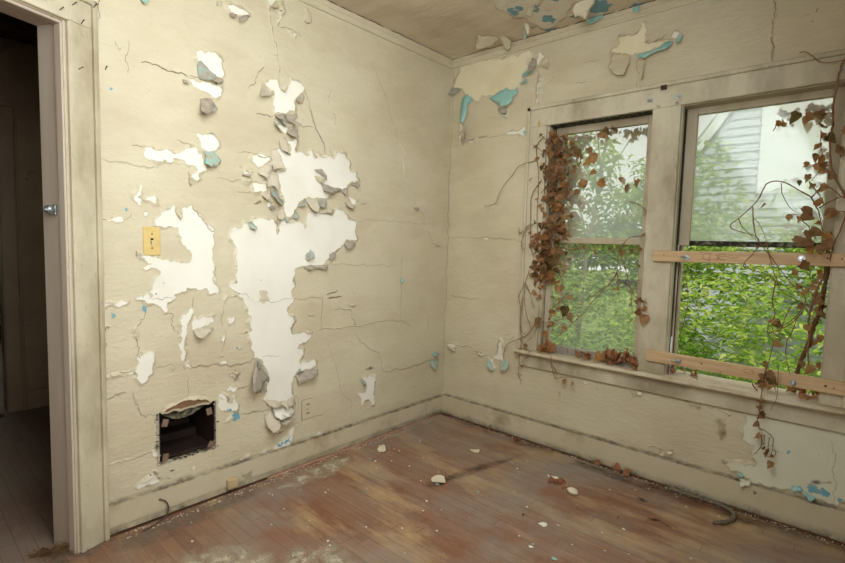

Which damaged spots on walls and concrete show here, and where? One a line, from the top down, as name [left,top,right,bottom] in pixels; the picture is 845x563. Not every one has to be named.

peeling [491,0,620,39]
peeling [608,3,683,85]
crack [770,0,778,62]
peeling [141,49,226,115]
peeling [446,35,549,146]
crack [101,159,158,170]
crack [293,73,520,378]
peeling [103,76,367,490]
crack [169,358,256,372]
crack [107,392,154,418]
crack [108,449,172,471]
peeling [721,412,845,507]